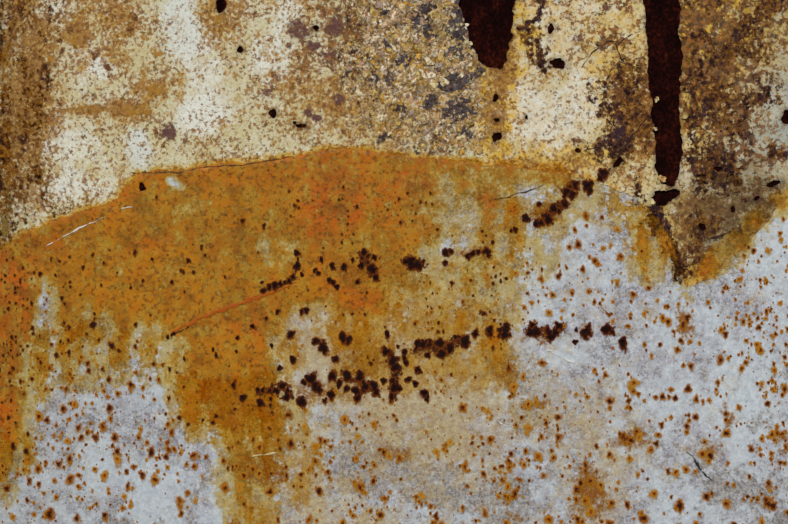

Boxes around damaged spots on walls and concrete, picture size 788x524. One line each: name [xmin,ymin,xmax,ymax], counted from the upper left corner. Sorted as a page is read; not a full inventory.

rust [631,0,788,293]
rust [0,0,575,524]
rust [577,234,624,283]
rust [572,272,633,353]
rust [642,298,701,371]
rust [706,239,788,412]
rust [624,372,678,412]
rust [422,413,699,524]
rust [742,421,788,504]